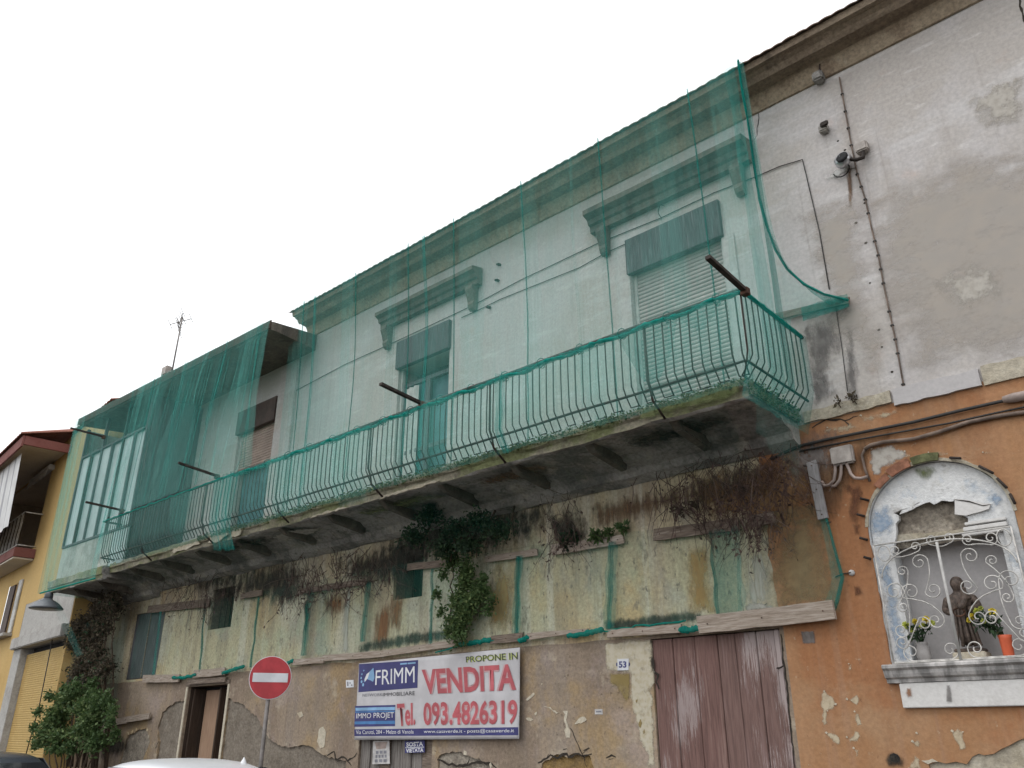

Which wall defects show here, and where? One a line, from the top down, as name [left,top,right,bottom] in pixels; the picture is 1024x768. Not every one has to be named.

water stain [806,327,856,400]
flaking render [872,496,1001,549]
rust [374,597,402,643]
peeling [880,566,908,660]
flaking render [120,698,184,764]
peeling [821,691,861,752]
flaking render [887,729,1024,768]